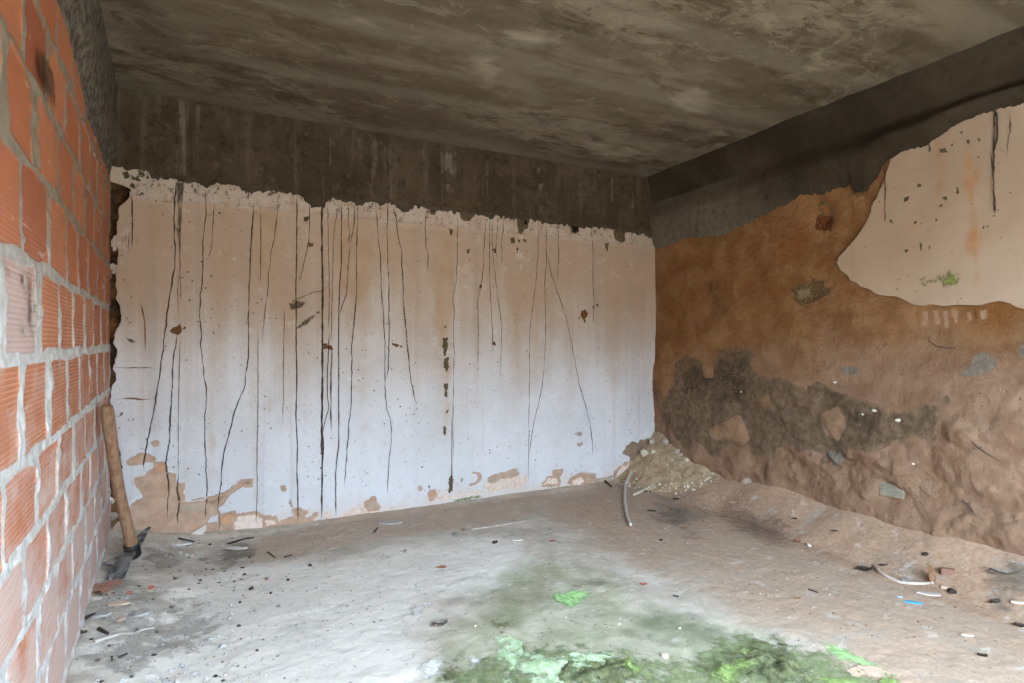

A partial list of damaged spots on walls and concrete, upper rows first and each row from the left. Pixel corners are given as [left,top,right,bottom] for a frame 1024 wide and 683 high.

spalling [109,182,131,398]
crack [119,183,279,527]
crack [292,205,429,492]
spalling [460,212,476,221]
crack [452,218,504,480]
spalling [517,219,530,234]
crack [528,227,593,469]
spalling [614,230,625,243]
damp [658,343,955,470]
spalling [808,199,836,235]
peeling [110,440,412,546]
peeling [418,436,650,505]